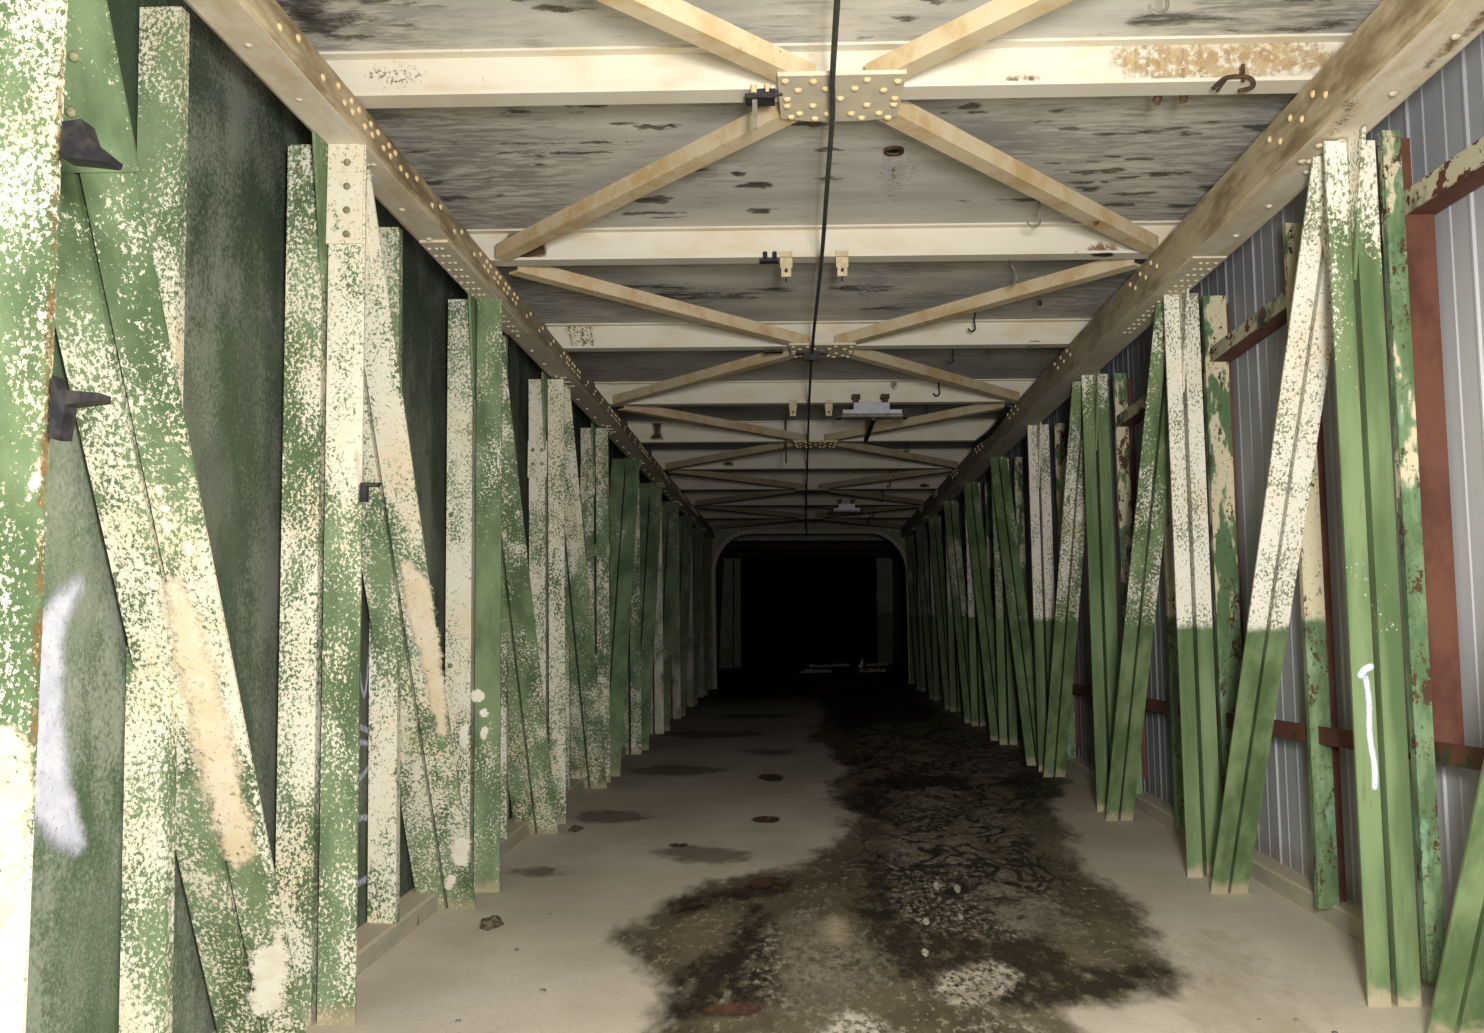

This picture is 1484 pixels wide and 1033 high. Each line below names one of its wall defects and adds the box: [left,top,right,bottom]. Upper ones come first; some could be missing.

rust [1425,11,1484,68]
peeling [26,450,46,501]
peeling [155,485,194,556]
peeling [160,575,256,870]
damp [614,685,1177,1033]
peeling [246,926,293,1018]